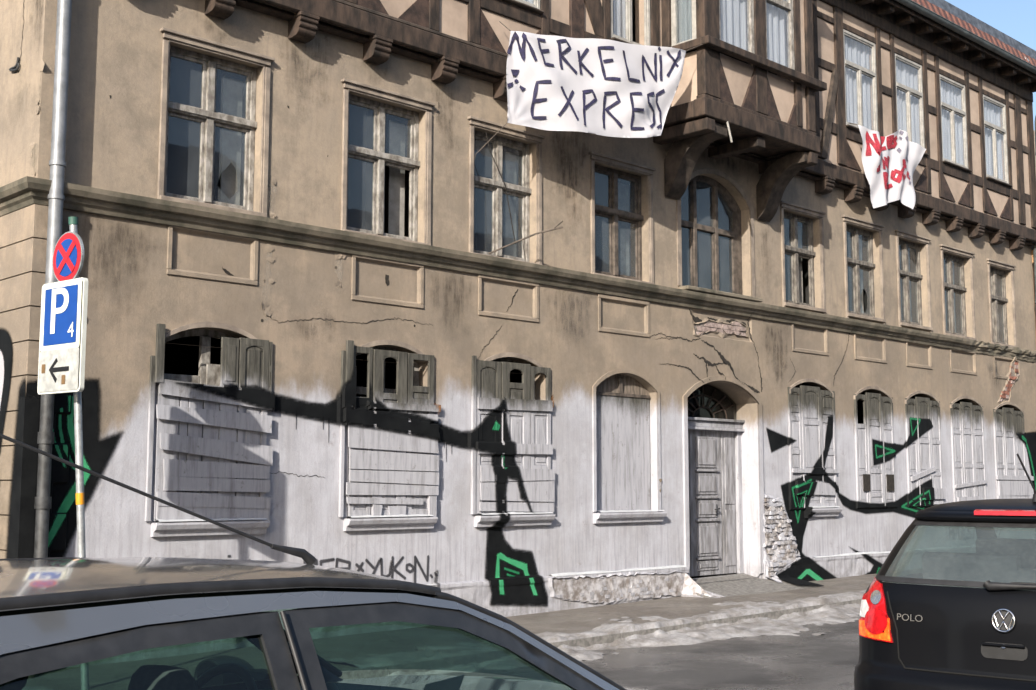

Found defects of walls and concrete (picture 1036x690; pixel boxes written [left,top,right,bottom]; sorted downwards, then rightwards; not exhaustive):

crack [268,316,429,326]
crack [652,309,763,393]
flaking render [692,318,749,338]
flaking render [762,493,801,583]